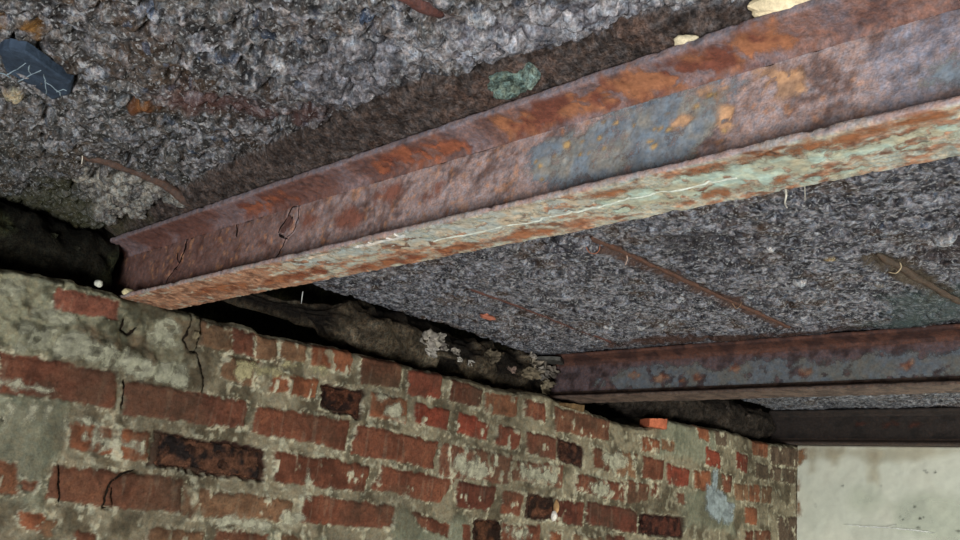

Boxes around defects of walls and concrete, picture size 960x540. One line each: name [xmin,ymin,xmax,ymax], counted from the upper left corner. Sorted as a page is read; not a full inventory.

corrosion [493,17,805,140]
corrosion [682,113,954,177]
corrosion [592,189,628,198]
corrosion [702,188,739,199]
crack [276,206,299,257]
corrosion [264,269,327,285]
corrosion [351,245,474,270]
corrosion [598,246,863,348]
crack [120,319,137,336]
crack [182,312,204,391]
crack [54,466,62,505]
crack [101,470,133,509]